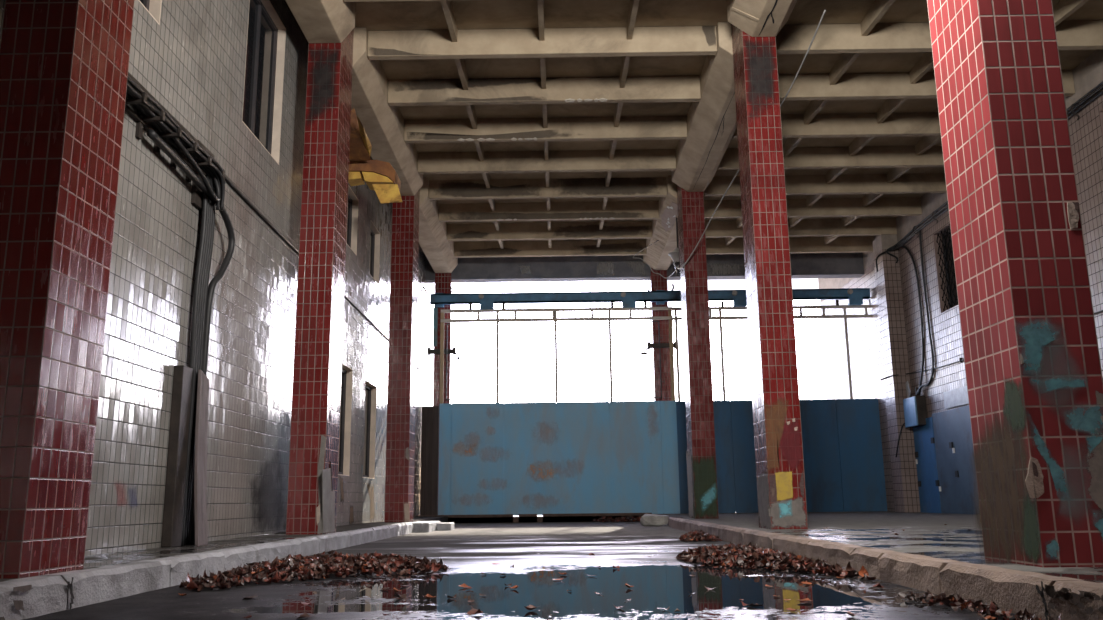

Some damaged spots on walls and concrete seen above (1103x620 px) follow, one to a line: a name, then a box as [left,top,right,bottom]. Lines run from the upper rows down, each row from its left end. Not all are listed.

spalling [1025,456,1044,498]